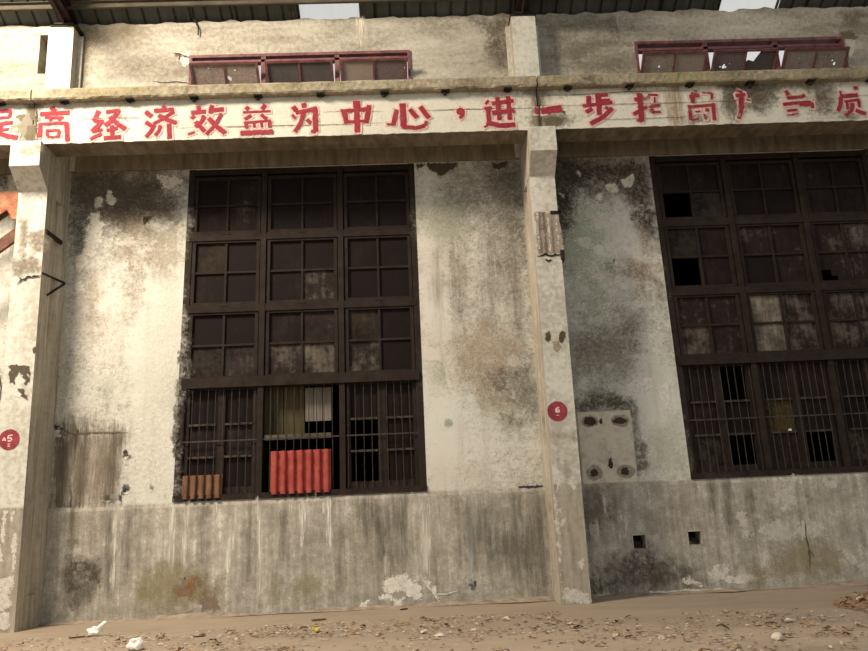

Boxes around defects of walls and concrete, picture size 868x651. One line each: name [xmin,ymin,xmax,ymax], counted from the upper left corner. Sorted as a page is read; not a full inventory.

leakage [70,171,180,253]
peeling [594,174,636,202]
spalling [8,364,31,400]
leakage [51,425,122,508]
leakage [631,412,648,476]
leakage [110,513,118,588]
leakage [156,503,190,580]
leakage [216,506,238,582]
leakage [276,498,333,559]
peeling [359,573,440,607]
leakage [408,496,442,574]
leakage [591,554,761,596]